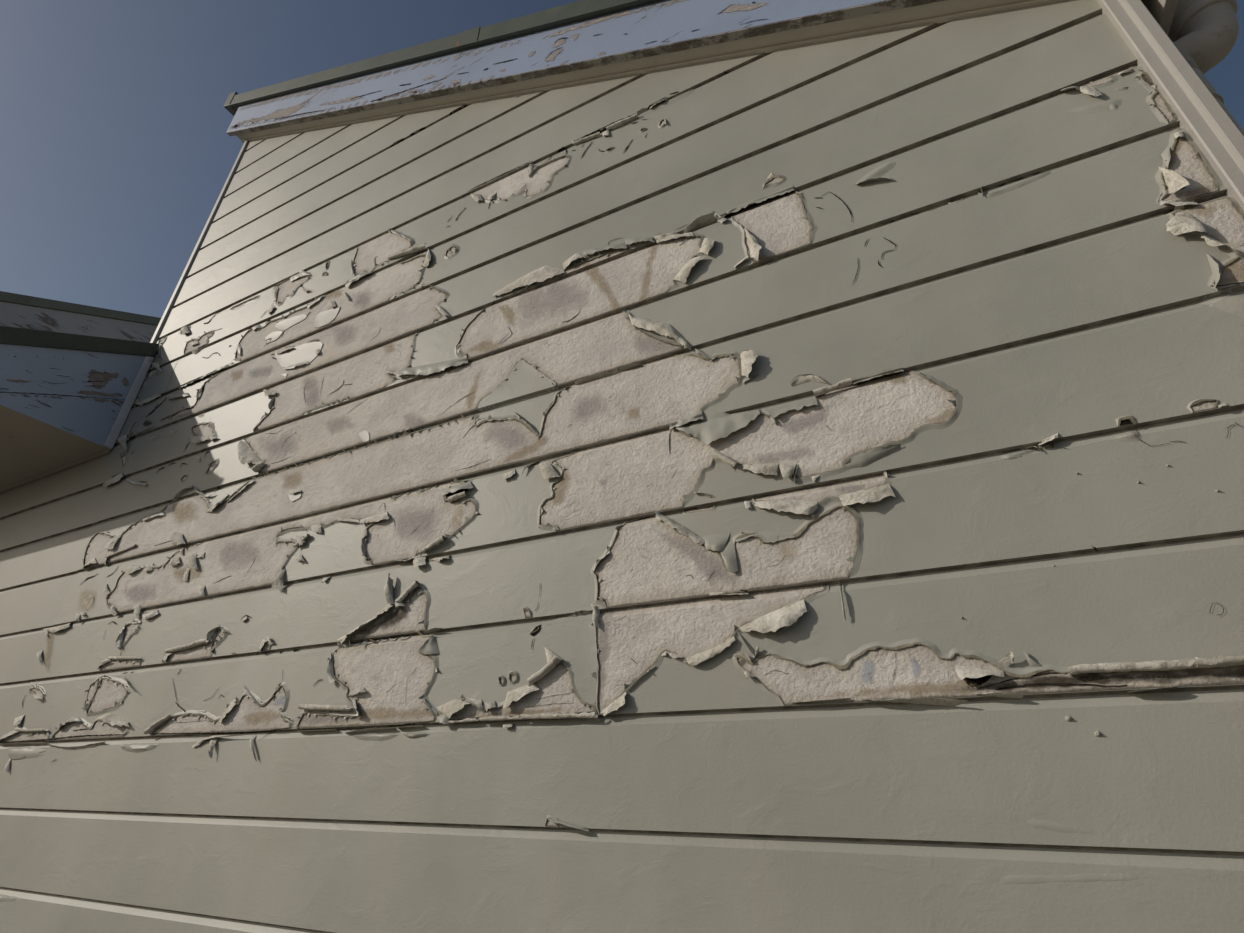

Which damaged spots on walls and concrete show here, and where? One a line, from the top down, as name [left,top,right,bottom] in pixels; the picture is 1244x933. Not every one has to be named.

peeling [229,0,684,129]
peeling [718,2,767,25]
peeling [447,86,701,227]
peeling [855,161,896,186]
peeling [1060,66,1244,318]
peeling [0,172,1244,772]
peeling [545,815,589,832]